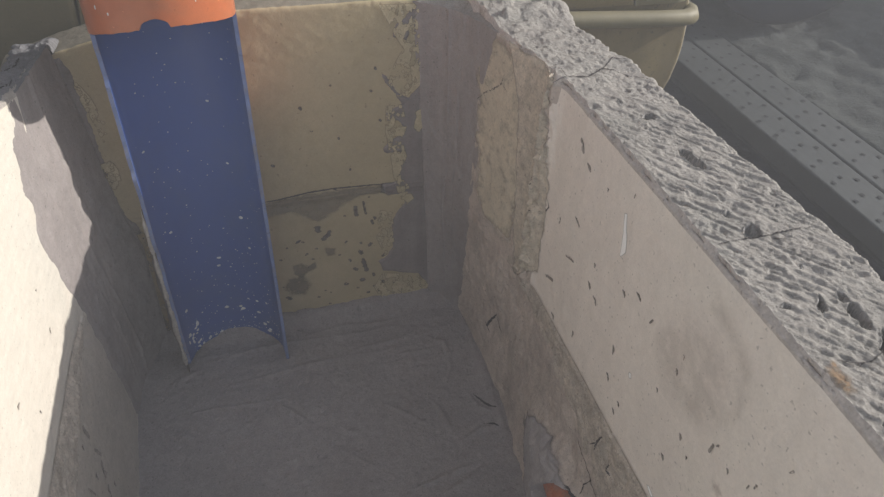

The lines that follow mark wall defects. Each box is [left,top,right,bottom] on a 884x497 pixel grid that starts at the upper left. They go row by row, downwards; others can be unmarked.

crack [551,57,648,83]
peeling [378,3,422,206]
crack [719,226,811,244]
crack [839,352,883,367]